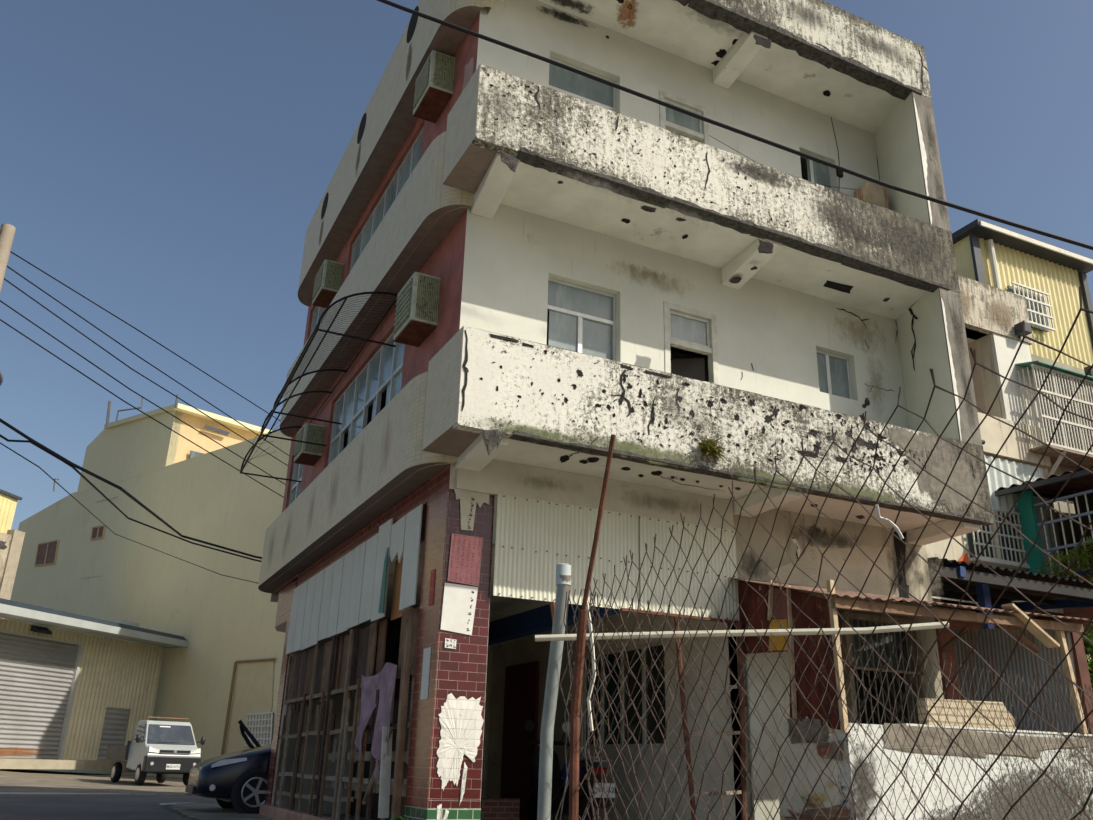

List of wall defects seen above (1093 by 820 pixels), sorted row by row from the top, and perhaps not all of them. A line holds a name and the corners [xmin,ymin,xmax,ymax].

damp [542,0,592,26]
corrosion [618,0,636,27]
damp [792,2,822,27]
damp [861,36,901,59]
spalling [675,0,932,224]
damp [722,157,792,188]
crack [836,308,869,348]
crack [895,299,919,371]
crack [461,330,469,411]
crack [611,370,680,435]
spalling [481,364,983,524]
peeling [893,531,910,603]